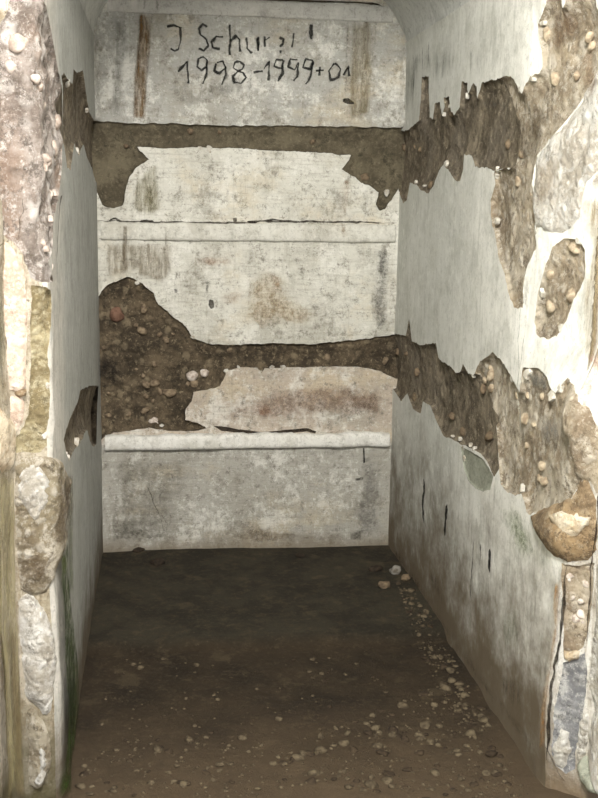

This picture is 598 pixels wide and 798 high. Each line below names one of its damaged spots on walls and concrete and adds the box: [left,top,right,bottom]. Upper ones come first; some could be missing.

corrosion [134,15,149,117]
crack [99,216,394,224]
flaking render [0,0,598,473]
flaking render [64,277,598,515]
crack [546,567,567,763]
flaking render [551,563,598,774]
crack [586,496,598,641]